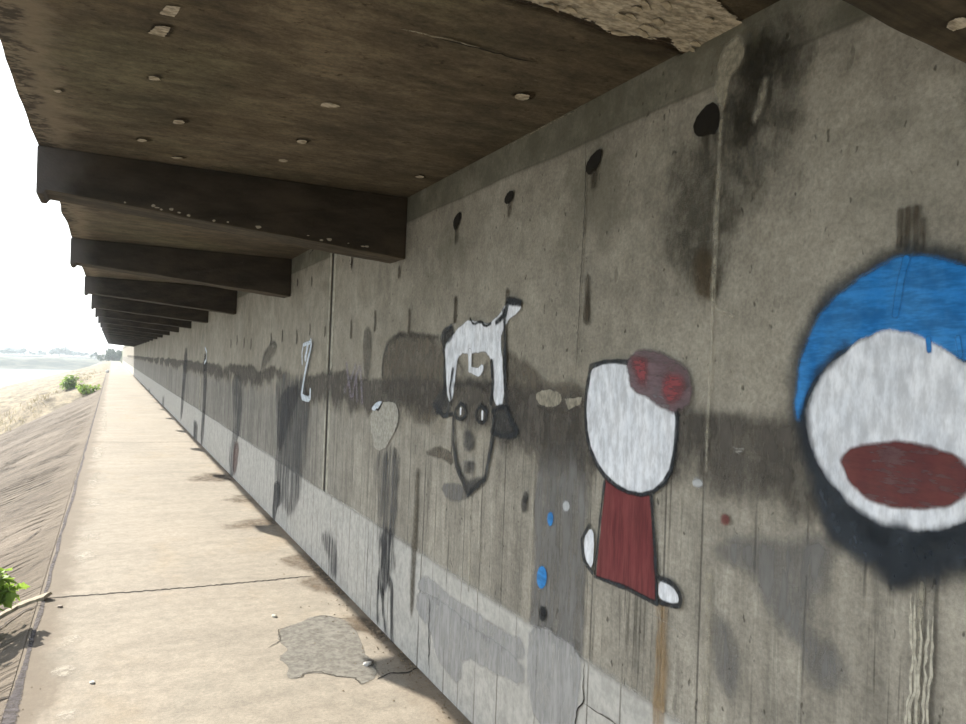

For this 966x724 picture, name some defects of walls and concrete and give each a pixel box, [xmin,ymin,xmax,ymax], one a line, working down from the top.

peeling [505,0,742,55]
leakage [670,31,812,322]
crack [575,665,615,724]
efflorescence [904,581,934,724]